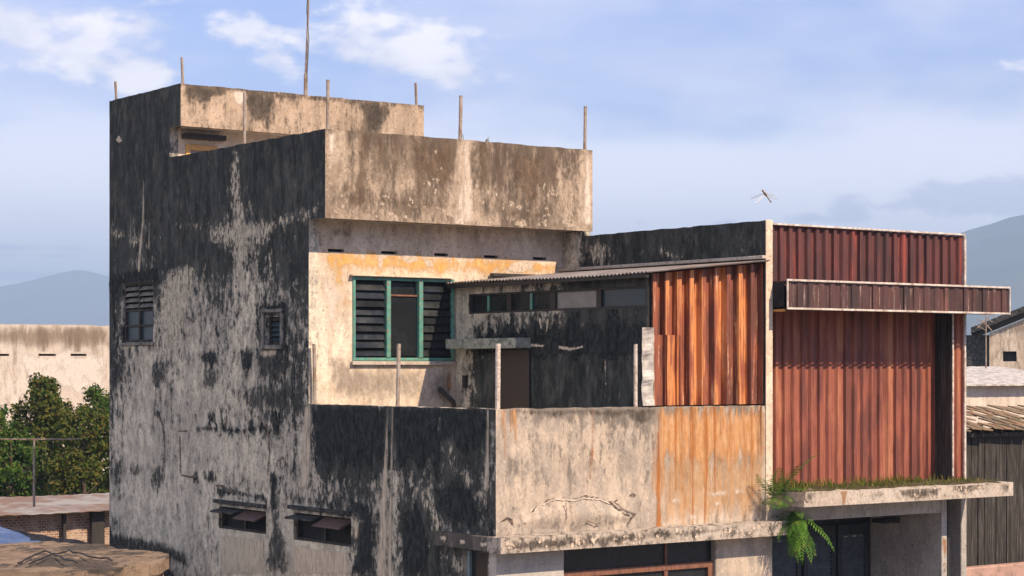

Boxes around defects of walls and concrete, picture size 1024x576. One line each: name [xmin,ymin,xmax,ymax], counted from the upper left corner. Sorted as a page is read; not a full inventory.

leakage [186,89,221,102]
leakage [249,95,279,127]
leakage [349,102,389,205]
leakage [415,142,487,224]
leakage [660,228,693,265]
leakage [214,406,489,576]
crack [501,493,636,526]
rust [653,406,765,527]